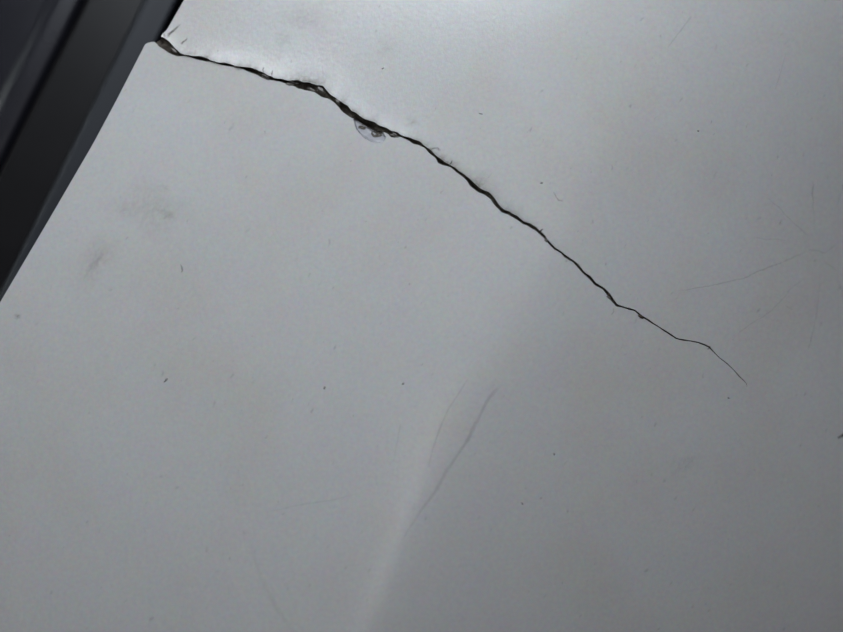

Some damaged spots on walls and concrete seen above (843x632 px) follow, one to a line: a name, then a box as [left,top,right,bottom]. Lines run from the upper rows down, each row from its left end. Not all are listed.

crack [155,30,747,385]